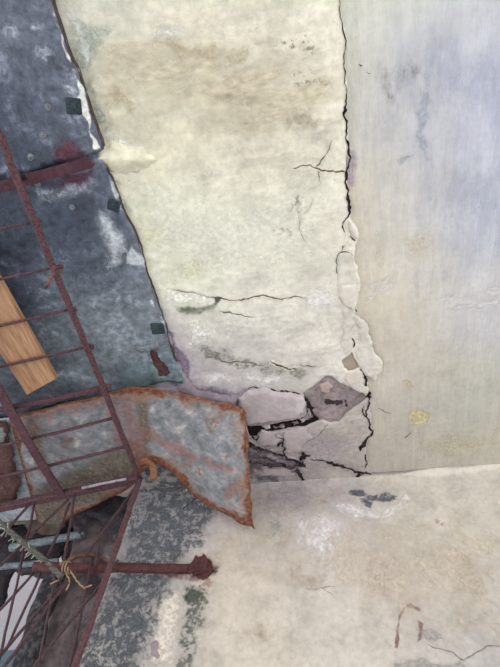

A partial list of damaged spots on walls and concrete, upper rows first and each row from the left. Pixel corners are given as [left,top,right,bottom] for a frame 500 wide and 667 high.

crack [293,0,370,274]
crack [286,195,312,242]
crack [172,287,320,317]
crack [248,369,391,481]